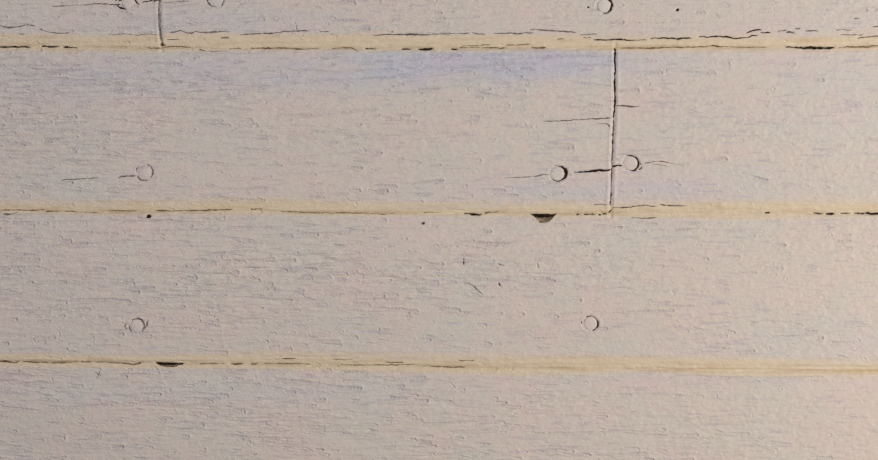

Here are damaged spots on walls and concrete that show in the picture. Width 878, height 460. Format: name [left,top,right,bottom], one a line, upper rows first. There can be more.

peeling [531,214,555,223]